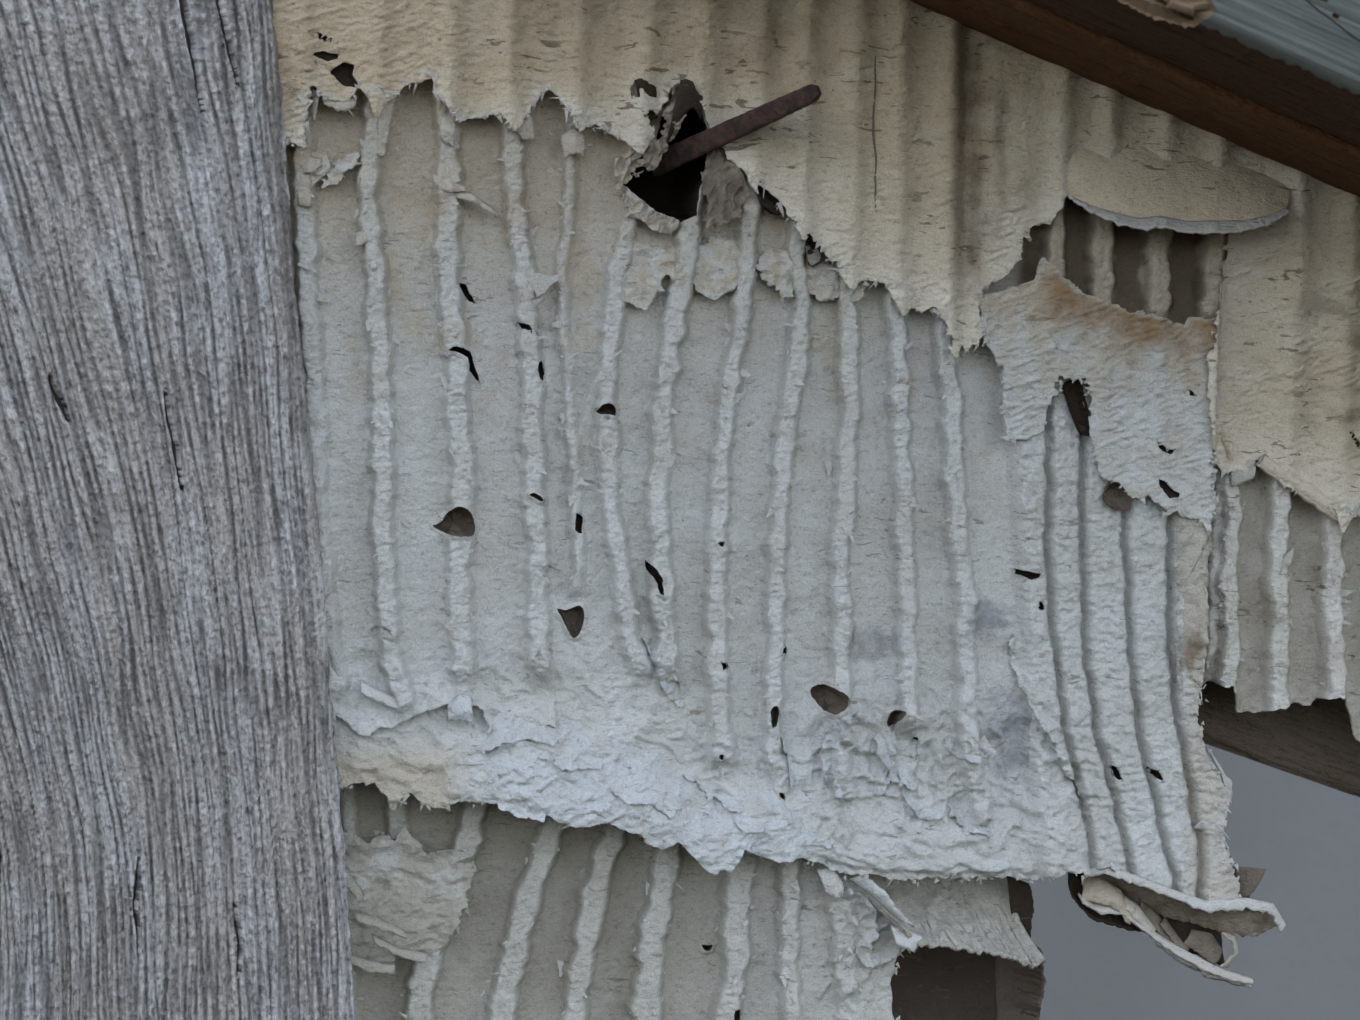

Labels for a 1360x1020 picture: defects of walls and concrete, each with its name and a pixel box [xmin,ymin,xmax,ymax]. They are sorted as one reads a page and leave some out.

peeling [297,156,355,208]
peeling [310,89,358,122]
peeling [439,113,456,148]
peeling [432,174,498,218]
peeling [560,129,585,158]
peeling [1066,146,1291,235]
peeling [1173,426,1360,692]
peeling [327,637,556,736]
peeling [1008,628,1098,805]
peeling [344,828,474,975]
peeling [816,867,1046,970]
peeling [1068,820,1286,989]